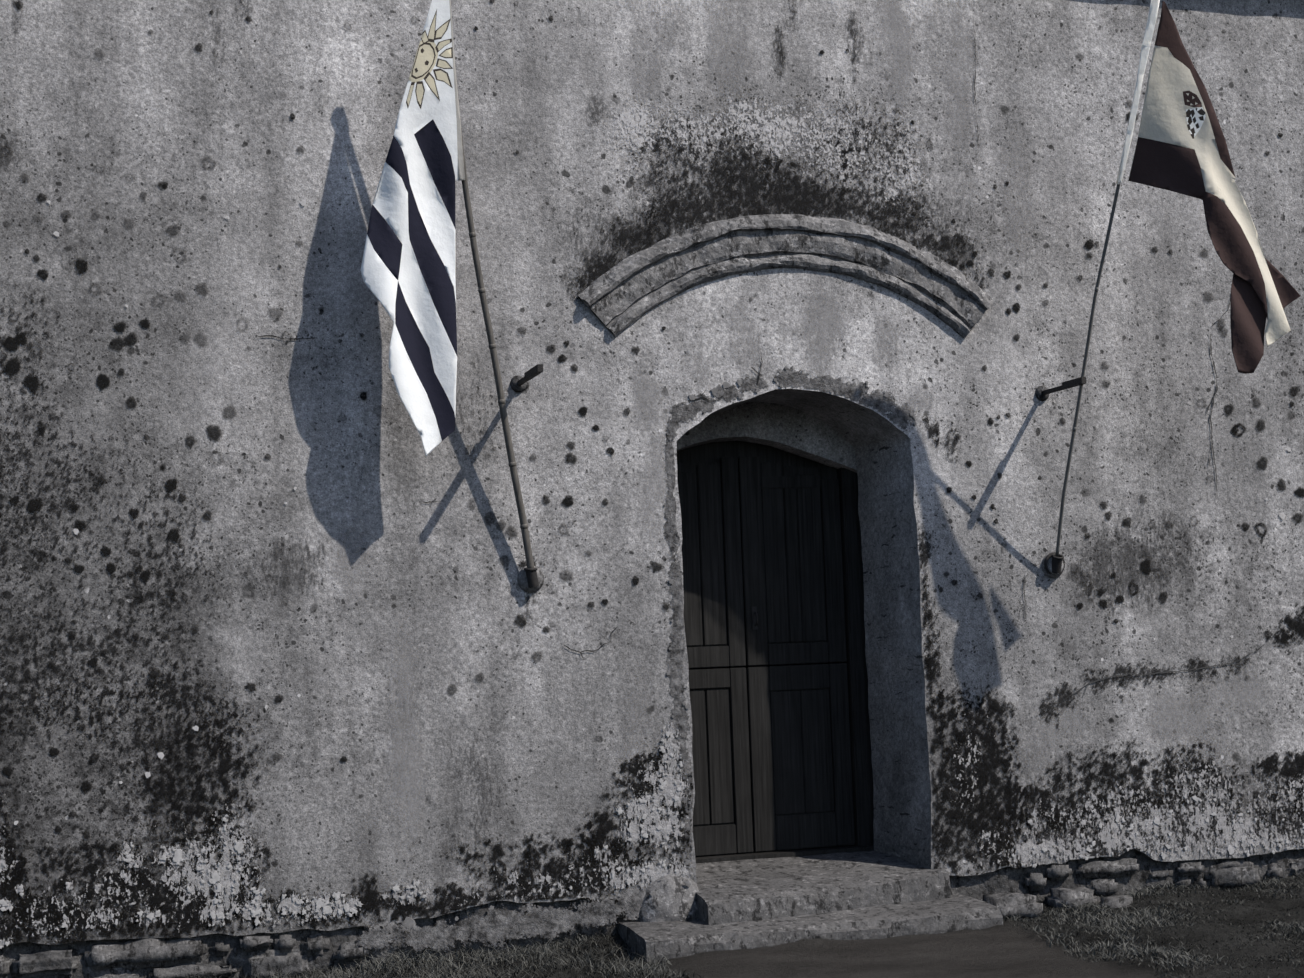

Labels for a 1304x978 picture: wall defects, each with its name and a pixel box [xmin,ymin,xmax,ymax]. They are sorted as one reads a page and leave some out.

leakage [568,0,992,300]
leakage [0,283,694,944]
leakage [919,517,1304,876]
crack [1048,636,1274,710]